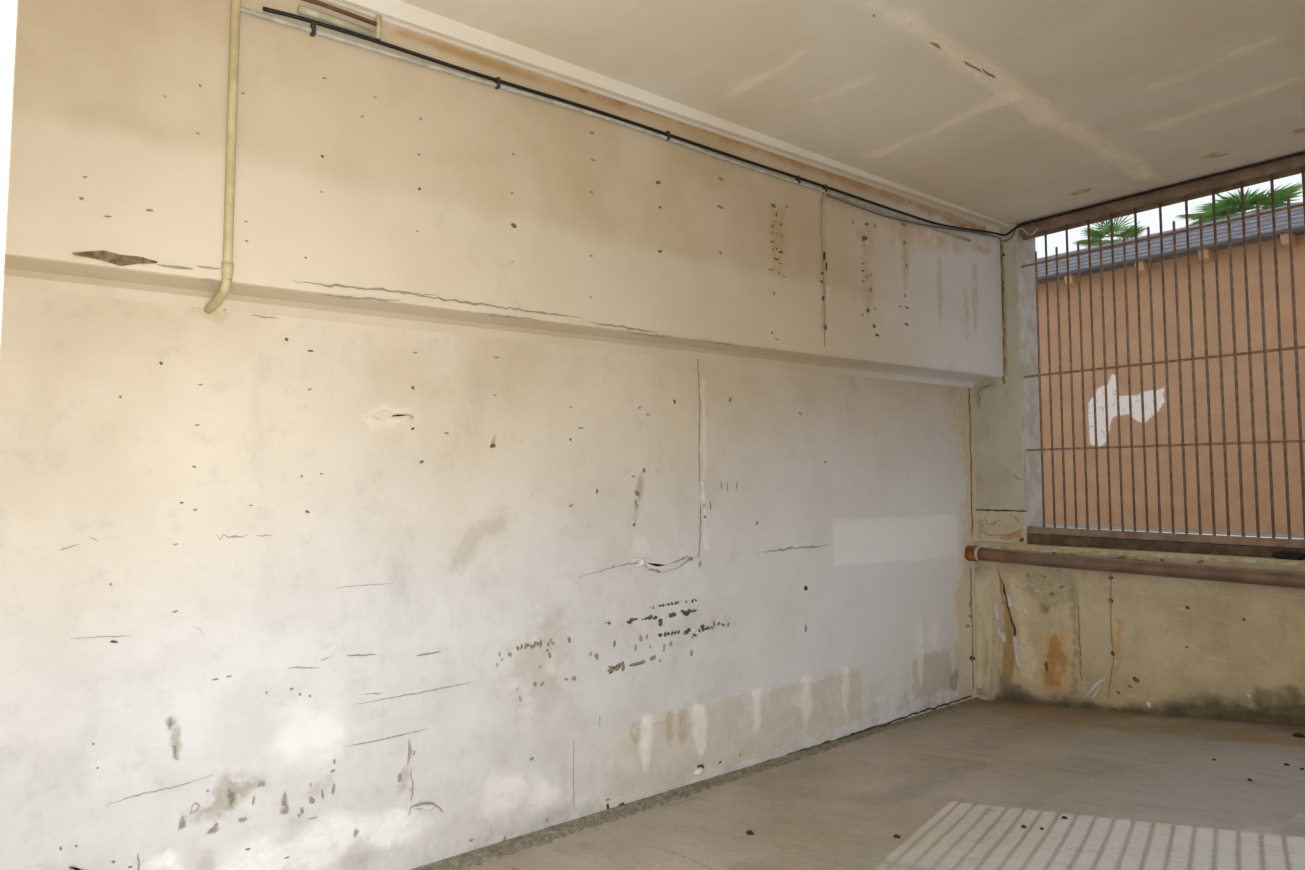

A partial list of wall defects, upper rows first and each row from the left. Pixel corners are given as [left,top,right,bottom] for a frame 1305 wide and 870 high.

crack [820,193,829,347]
crack [968,241,1027,535]
crack [756,567,975,765]
rust [1045,638,1065,686]
damp [995,692,1305,728]